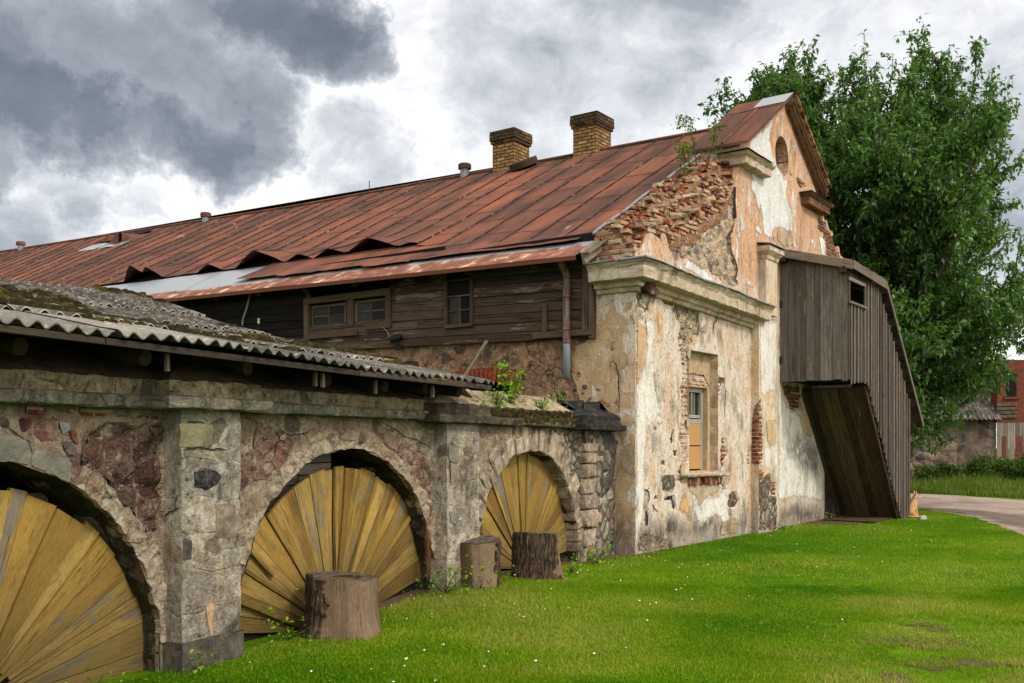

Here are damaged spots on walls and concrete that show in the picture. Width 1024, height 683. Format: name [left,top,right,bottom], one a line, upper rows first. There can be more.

spalling [606,165,762,252]
peeling [685,259,724,285]
crack [609,360,645,412]
spalling [639,299,707,551]
spalling [746,400,777,530]